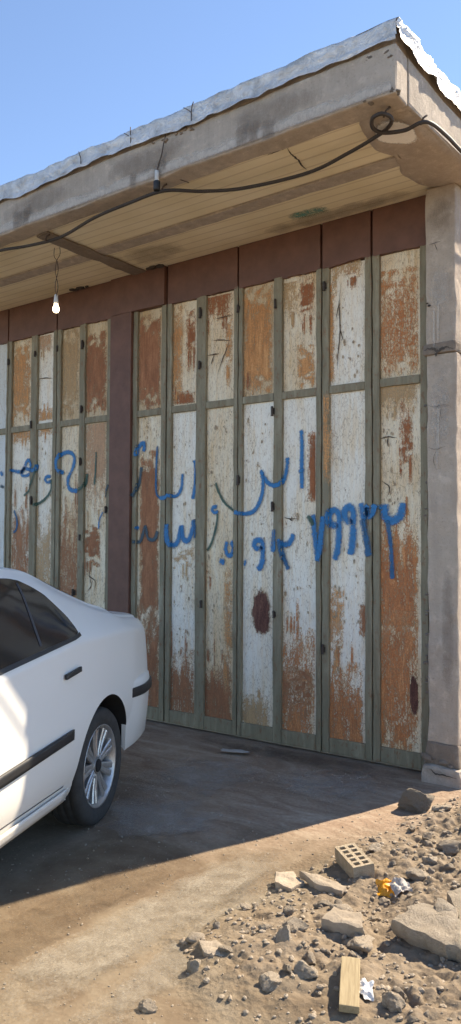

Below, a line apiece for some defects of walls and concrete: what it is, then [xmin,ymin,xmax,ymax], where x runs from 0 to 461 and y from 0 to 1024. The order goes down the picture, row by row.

corrosion [11,329,107,597]
corrosion [137,450,270,727]
corrosion [138,273,315,410]
corrosion [282,598,315,734]
corrosion [330,586,365,743]
corrosion [380,266,419,750]